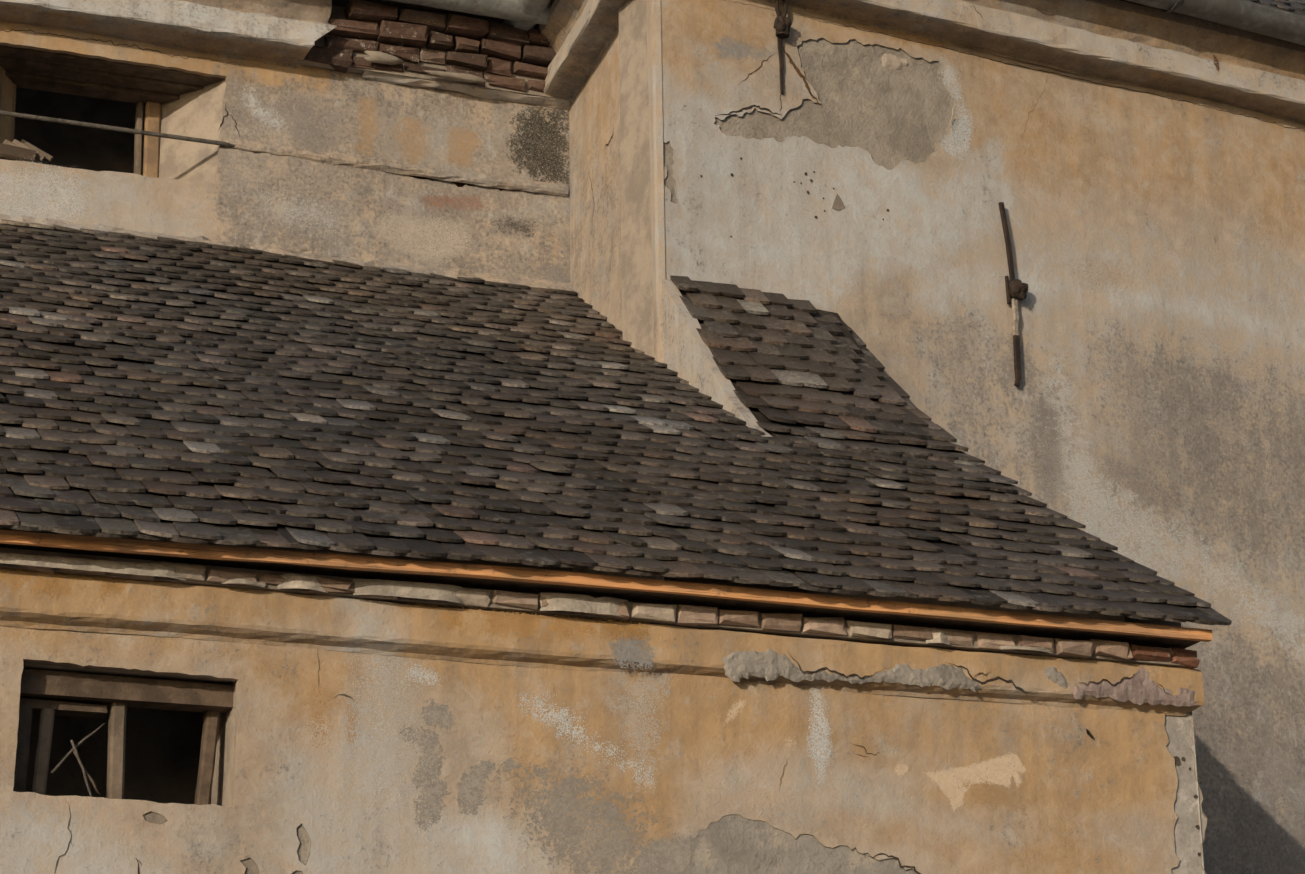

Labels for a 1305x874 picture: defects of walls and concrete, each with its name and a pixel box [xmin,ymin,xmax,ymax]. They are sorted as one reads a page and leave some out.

mould [502,103,570,198]
flaking render [793,171,845,219]
flaking render [714,38,968,170]
crack [739,2,1302,142]
water stain [1030,307,1305,671]
crack [54,808,73,873]
flaking render [143,811,167,824]
flaking render [292,823,311,874]
peeling [398,697,672,874]
flaking render [687,814,918,874]
peeling [924,752,1026,811]
flaking render [1164,711,1207,874]